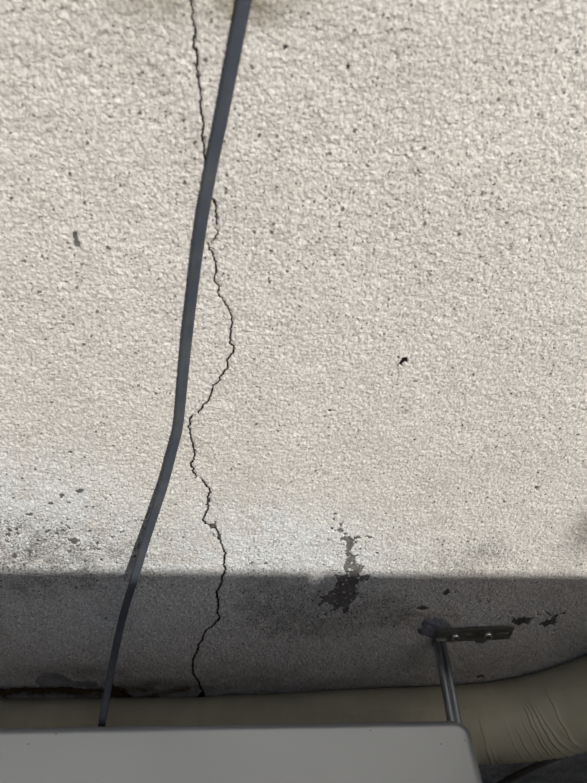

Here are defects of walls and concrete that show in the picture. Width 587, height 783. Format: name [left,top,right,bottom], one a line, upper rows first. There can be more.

crack [190,0,206,161]
crack [188,198,235,697]
peeling [508,611,566,632]